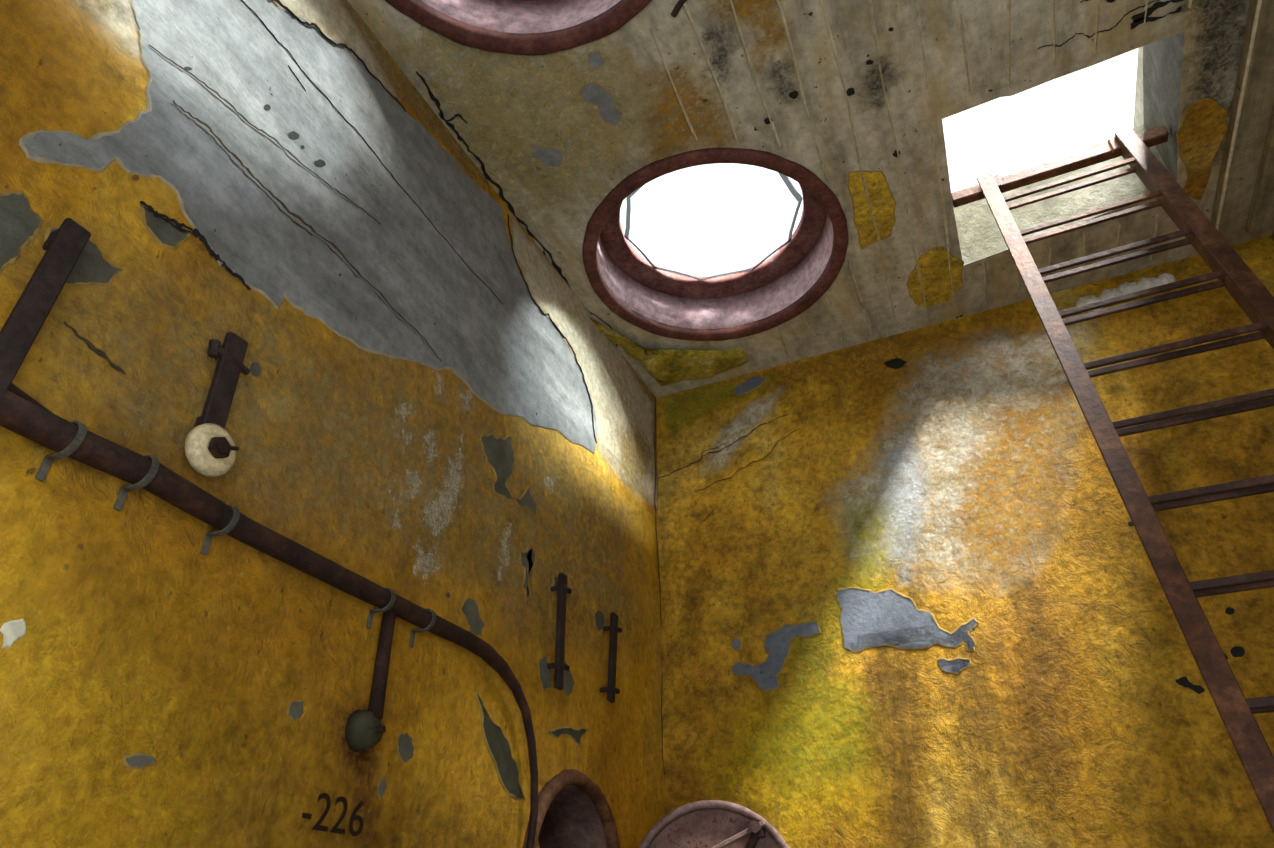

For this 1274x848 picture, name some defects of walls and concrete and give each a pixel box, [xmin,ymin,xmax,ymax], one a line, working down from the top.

spalling [671,0,687,18]
peeling [0,191,62,275]
peeling [19,0,657,518]
peeling [387,402,464,581]
peeling [496,523,536,602]
peeling [538,654,575,698]
peeling [730,620,822,692]
peeling [833,587,979,675]
peeling [475,691,525,800]